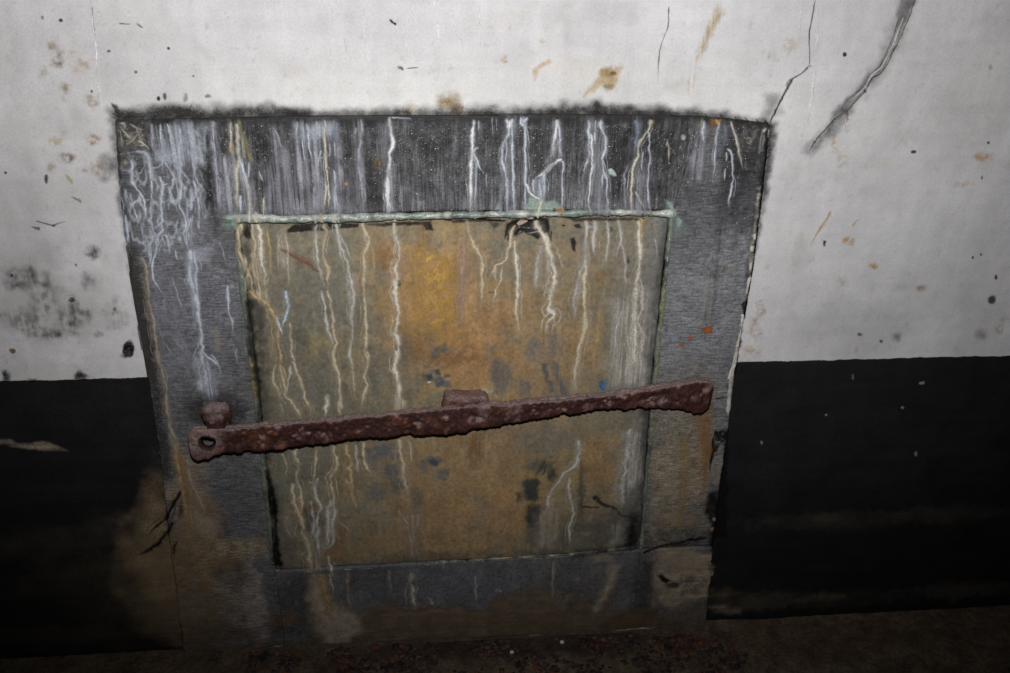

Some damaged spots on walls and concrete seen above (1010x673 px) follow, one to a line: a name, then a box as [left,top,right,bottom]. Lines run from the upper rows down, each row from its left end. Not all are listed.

corrosion [593,68,618,88]
crack [811,0,914,148]
water stain [97,84,776,449]
crack [716,3,815,399]
water stain [266,442,370,644]
water stain [395,439,412,490]
corrosion [174,377,714,531]
water stain [546,441,581,540]
water stain [614,429,641,502]